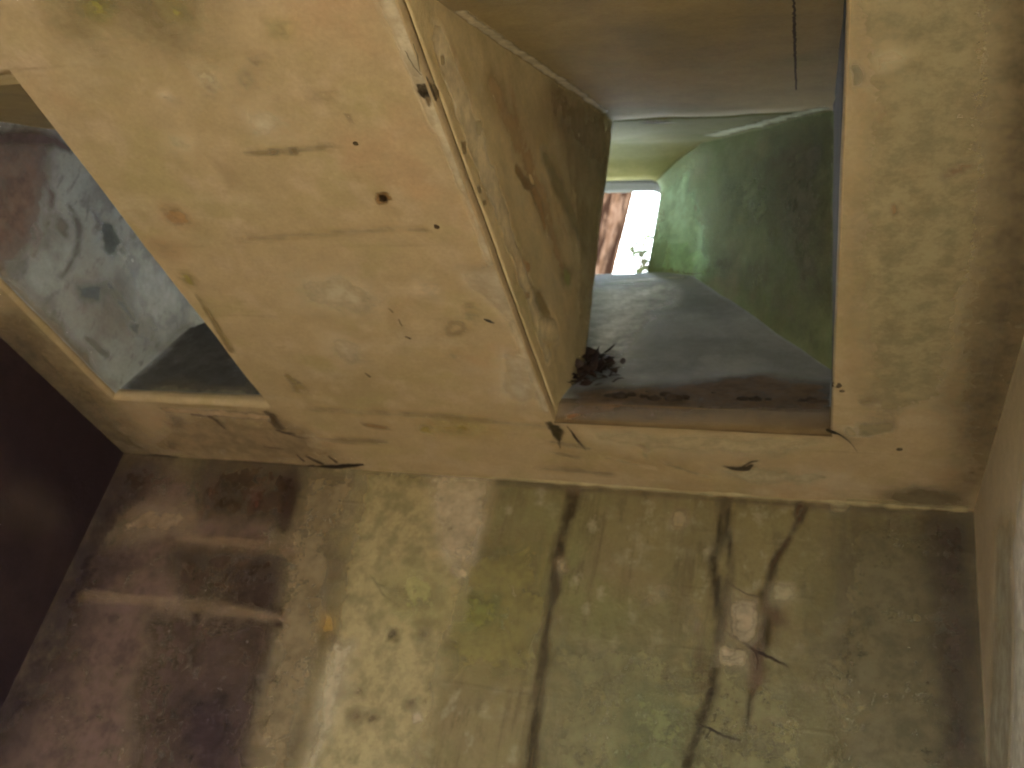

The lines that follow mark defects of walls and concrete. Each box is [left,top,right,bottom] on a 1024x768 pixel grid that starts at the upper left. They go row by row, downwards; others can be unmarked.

crack [726,632,788,671]
crack [695,723,741,741]